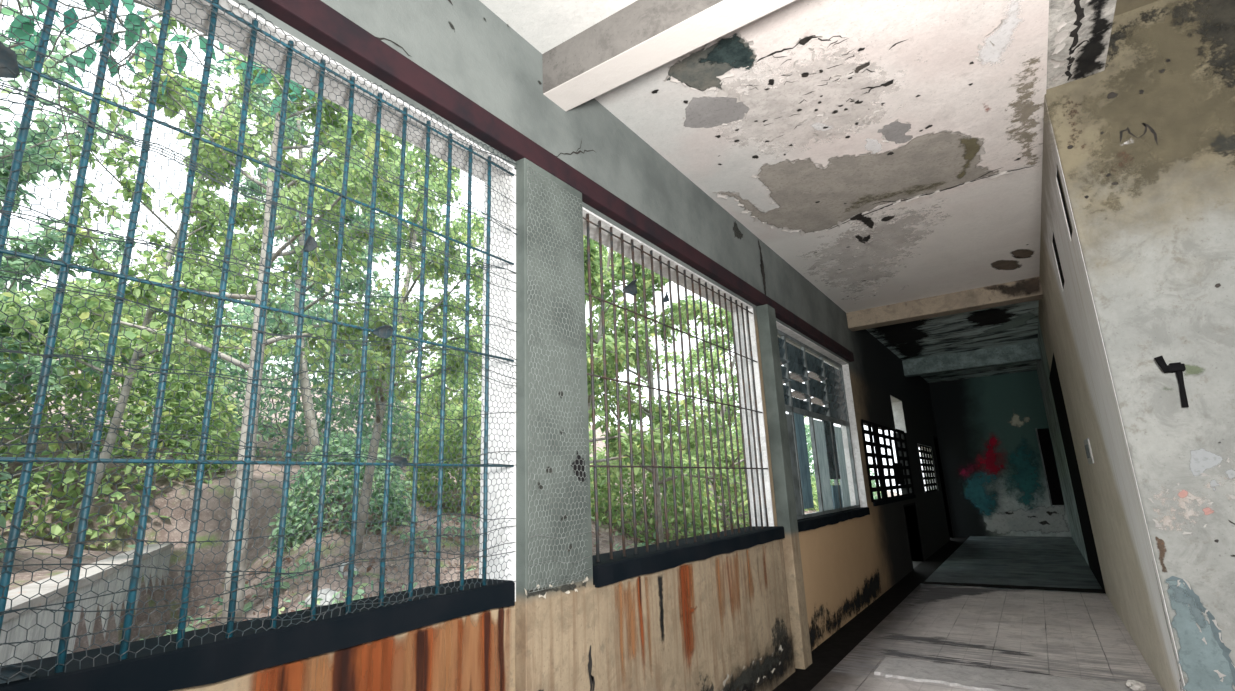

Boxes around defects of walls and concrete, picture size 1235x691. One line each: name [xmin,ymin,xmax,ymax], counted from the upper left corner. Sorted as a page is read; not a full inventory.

peeling [652,33,1021,248]
leakage [1079,0,1235,211]
corrosion [252,607,509,691]
corrosion [619,577,651,670]
corrosion [680,564,697,663]
leakage [701,618,794,691]
leakage [808,570,881,652]
peeling [1165,576,1235,691]